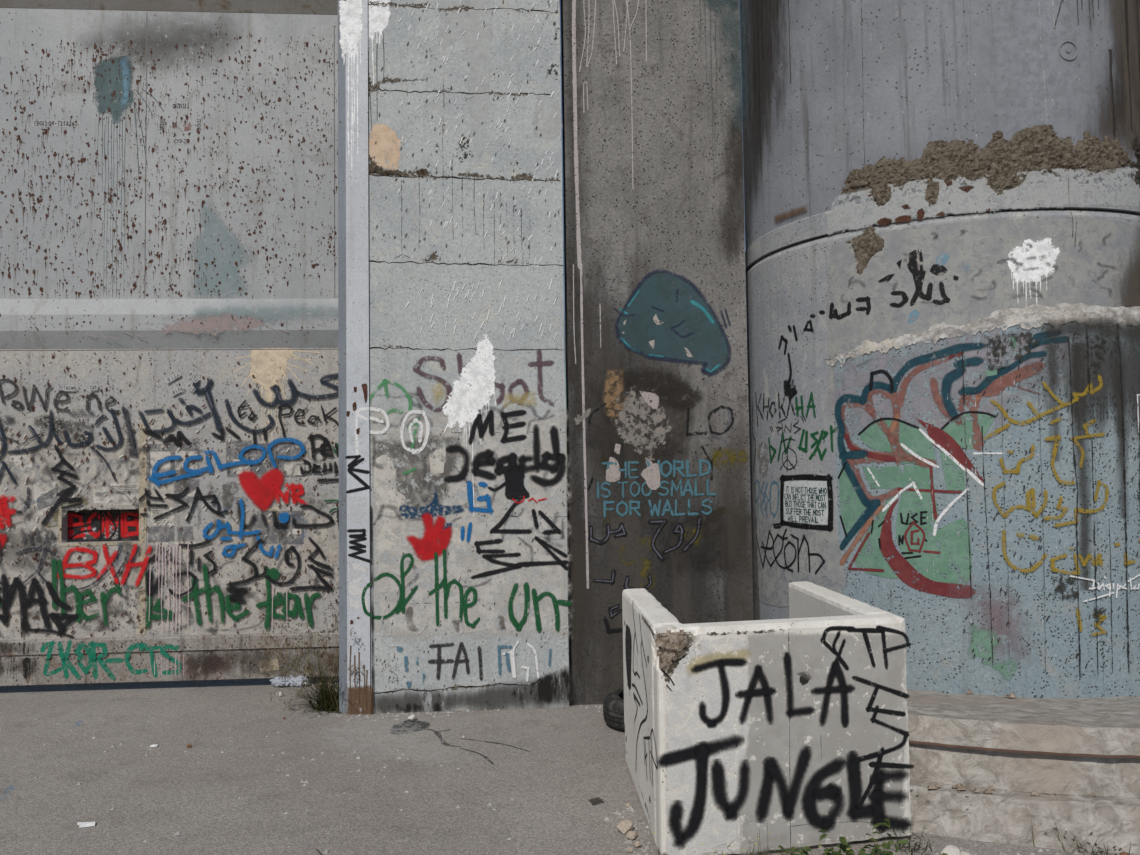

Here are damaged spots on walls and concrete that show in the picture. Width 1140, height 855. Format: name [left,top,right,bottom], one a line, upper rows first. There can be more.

corrosion [0,33,338,299]
water stain [725,0,790,252]
spalling [841,125,1140,206]
spalling [846,226,884,275]
spalling [984,332,1039,372]
spalling [1052,576,1079,600]
spalling [633,601,790,692]